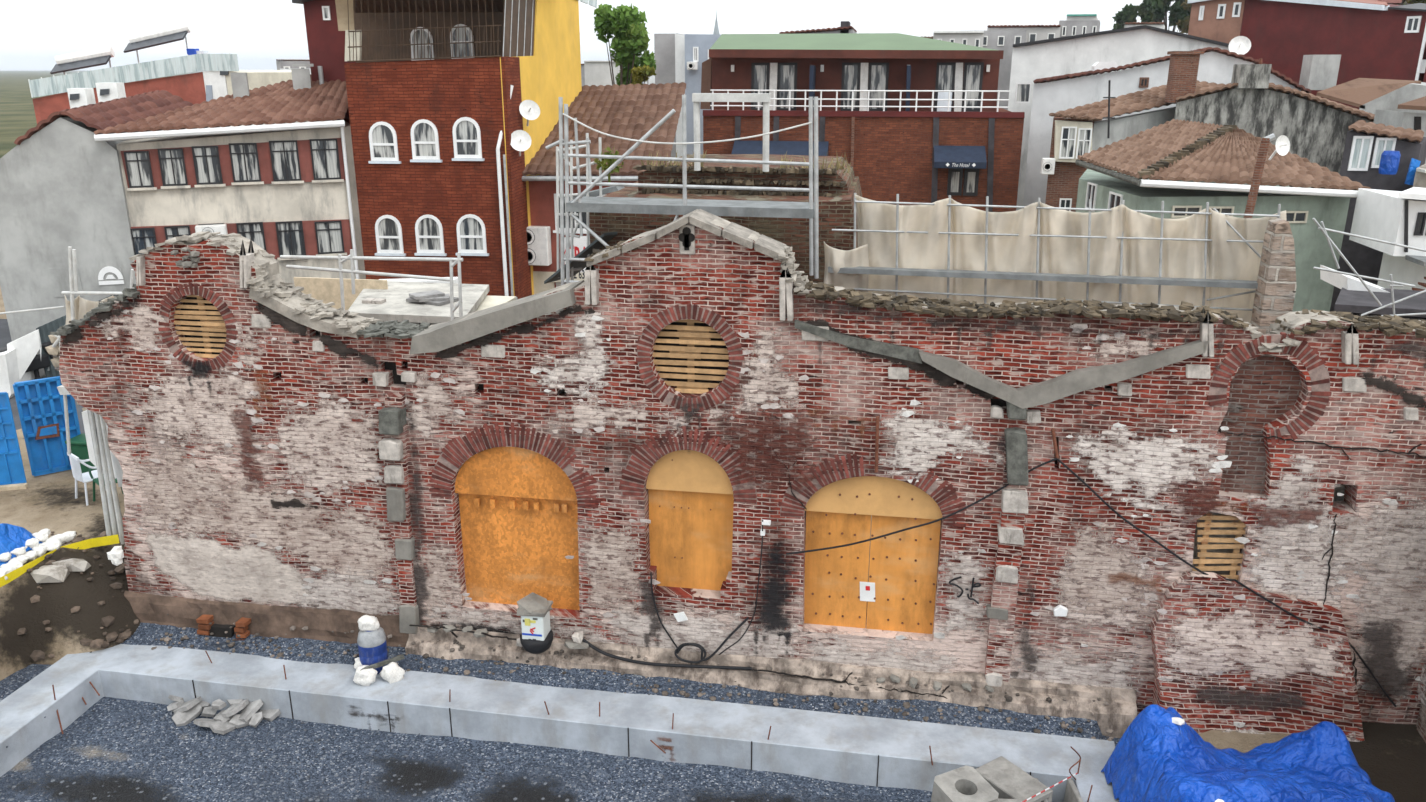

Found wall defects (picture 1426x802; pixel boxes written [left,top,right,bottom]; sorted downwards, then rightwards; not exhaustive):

flaking render [60,296,472,618]
flaking render [405,305,820,498]
flaking render [880,400,1004,483]
flaking render [1066,423,1232,526]
flaking render [1030,455,1426,711]